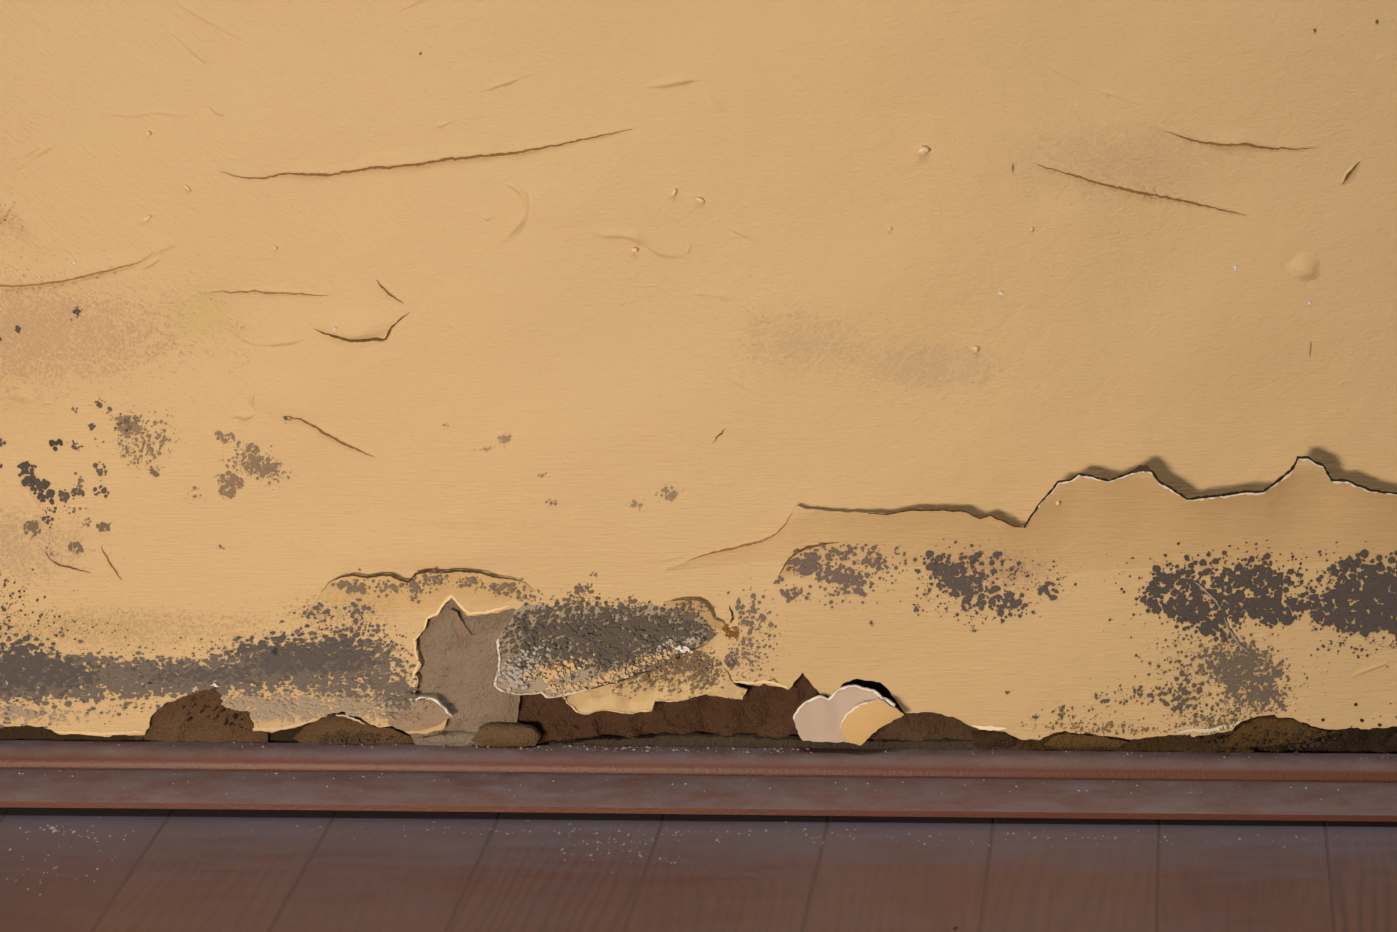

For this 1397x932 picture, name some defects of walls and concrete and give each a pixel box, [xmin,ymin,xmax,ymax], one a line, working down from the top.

leakage [932,96,1282,234]
leakage [0,78,1084,729]
peeling [664,459,1397,585]
peeling [0,683,364,743]
peeling [318,572,1397,754]
leakage [1013,539,1397,737]